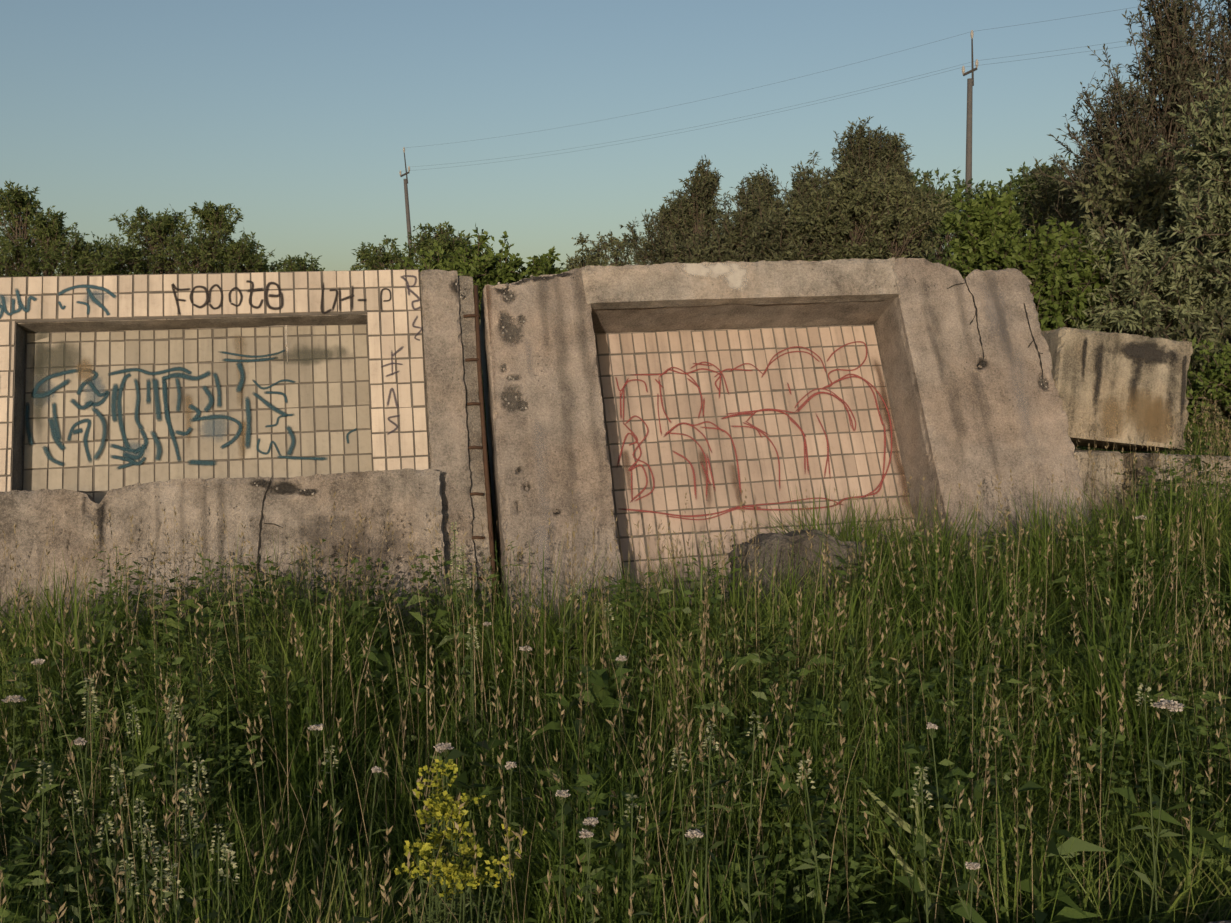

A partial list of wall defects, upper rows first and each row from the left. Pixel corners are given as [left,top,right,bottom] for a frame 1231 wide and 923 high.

spalling [501,364,528,412]
crack [947,277,984,362]
crack [1024,303,1044,387]
leakage [1082,339,1104,412]
leakage [1120,342,1187,416]
crack [243,477,303,608]